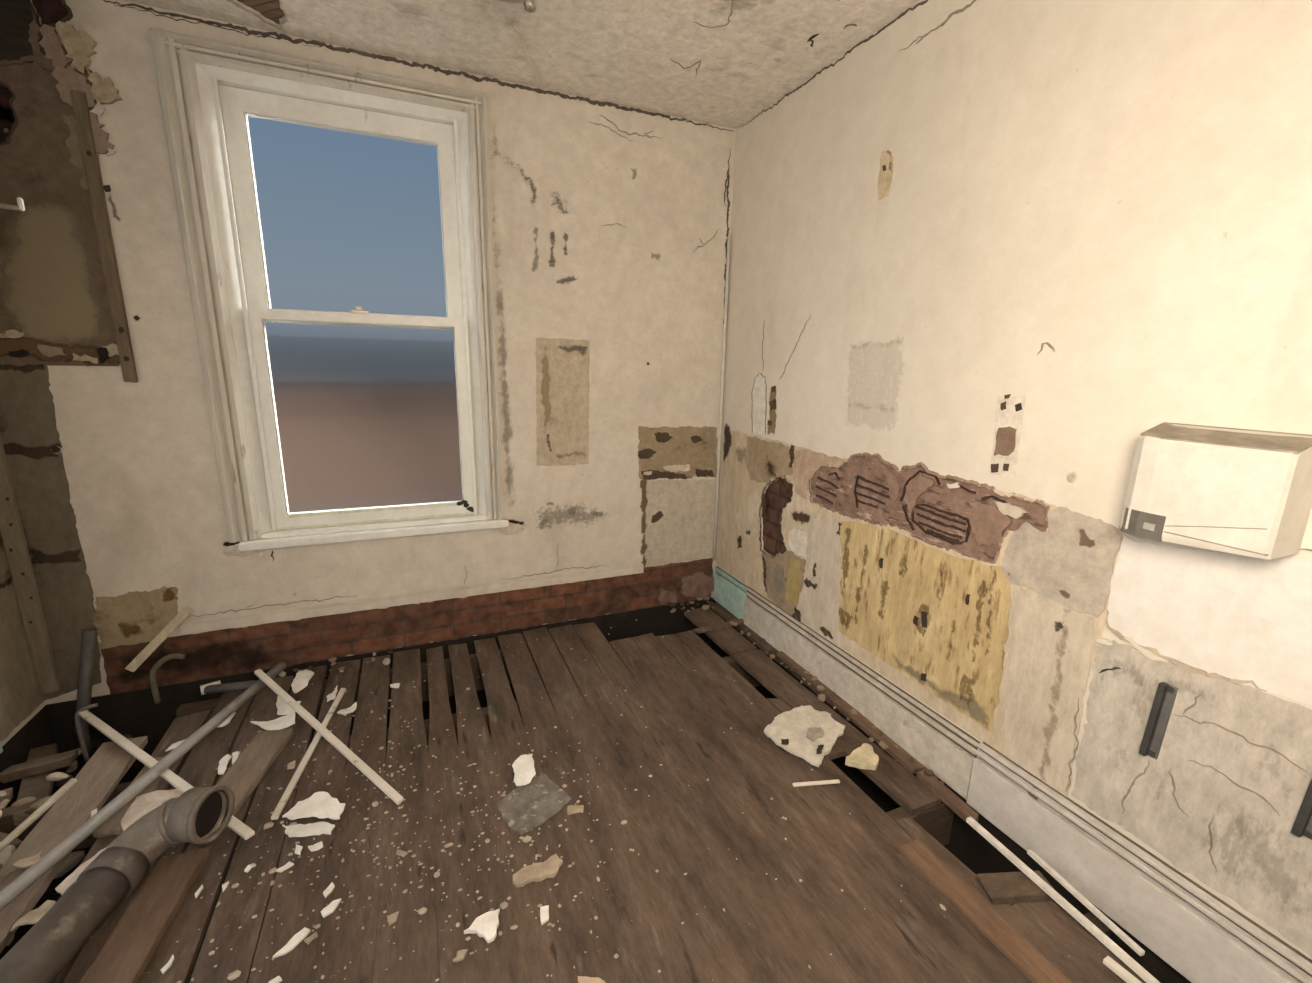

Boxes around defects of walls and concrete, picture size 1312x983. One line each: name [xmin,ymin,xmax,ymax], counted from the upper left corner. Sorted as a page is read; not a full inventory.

crack [103,0,976,325]
flaking render [0,0,716,700]
flaking render [989,394,1026,477]
water stain [820,522,868,639]
water stain [878,555,907,619]
water stain [972,571,996,661]
peeling [326,685,357,716]
water stain [898,663,986,724]
flaking render [716,429,1312,958]
peeling [276,792,345,872]
peeling [513,854,563,888]
flaking render [497,754,584,835]